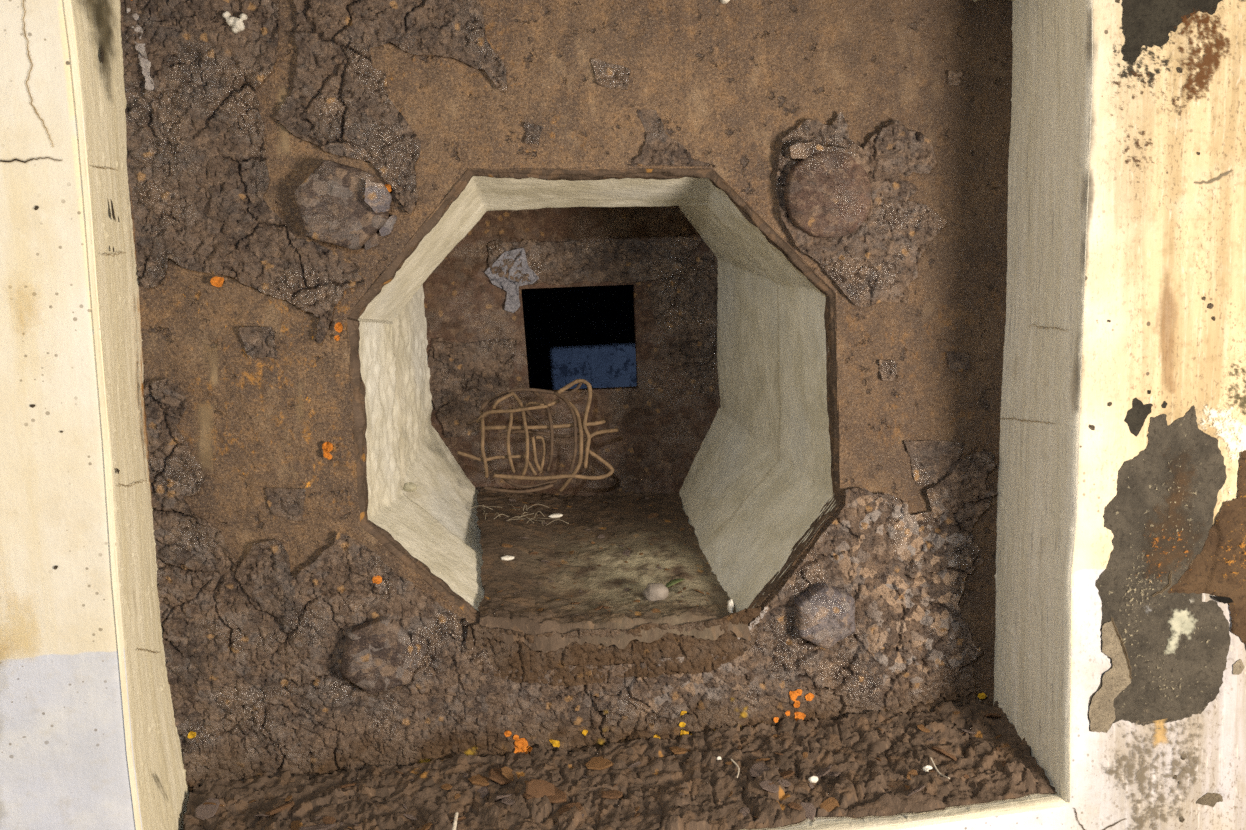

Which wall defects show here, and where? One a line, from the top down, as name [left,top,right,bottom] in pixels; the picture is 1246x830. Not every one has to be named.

crack [0,0,60,163]
rust [1107,12,1231,183]
peeling [1113,0,1245,88]
peeling [1088,390,1244,830]
rust [1168,450,1246,644]